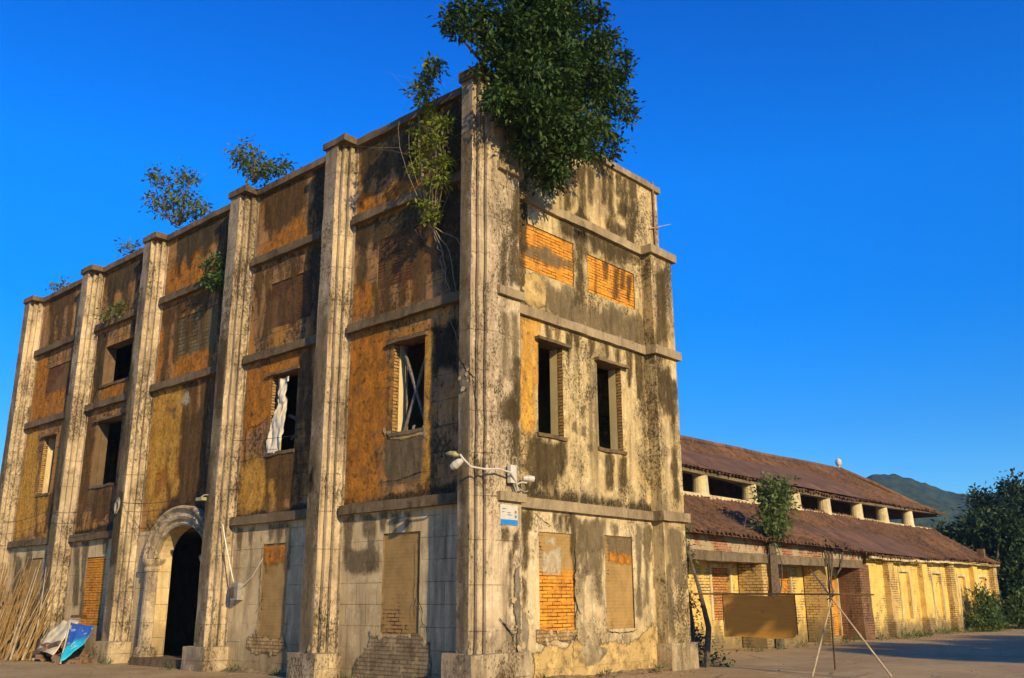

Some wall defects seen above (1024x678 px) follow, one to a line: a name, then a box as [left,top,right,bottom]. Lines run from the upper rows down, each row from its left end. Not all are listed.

leakage [502,165,680,501]
leakage [344,399,469,644]
flaking render [246,628,286,657]
flaking render [352,630,432,678]
flaking render [511,566,658,678]